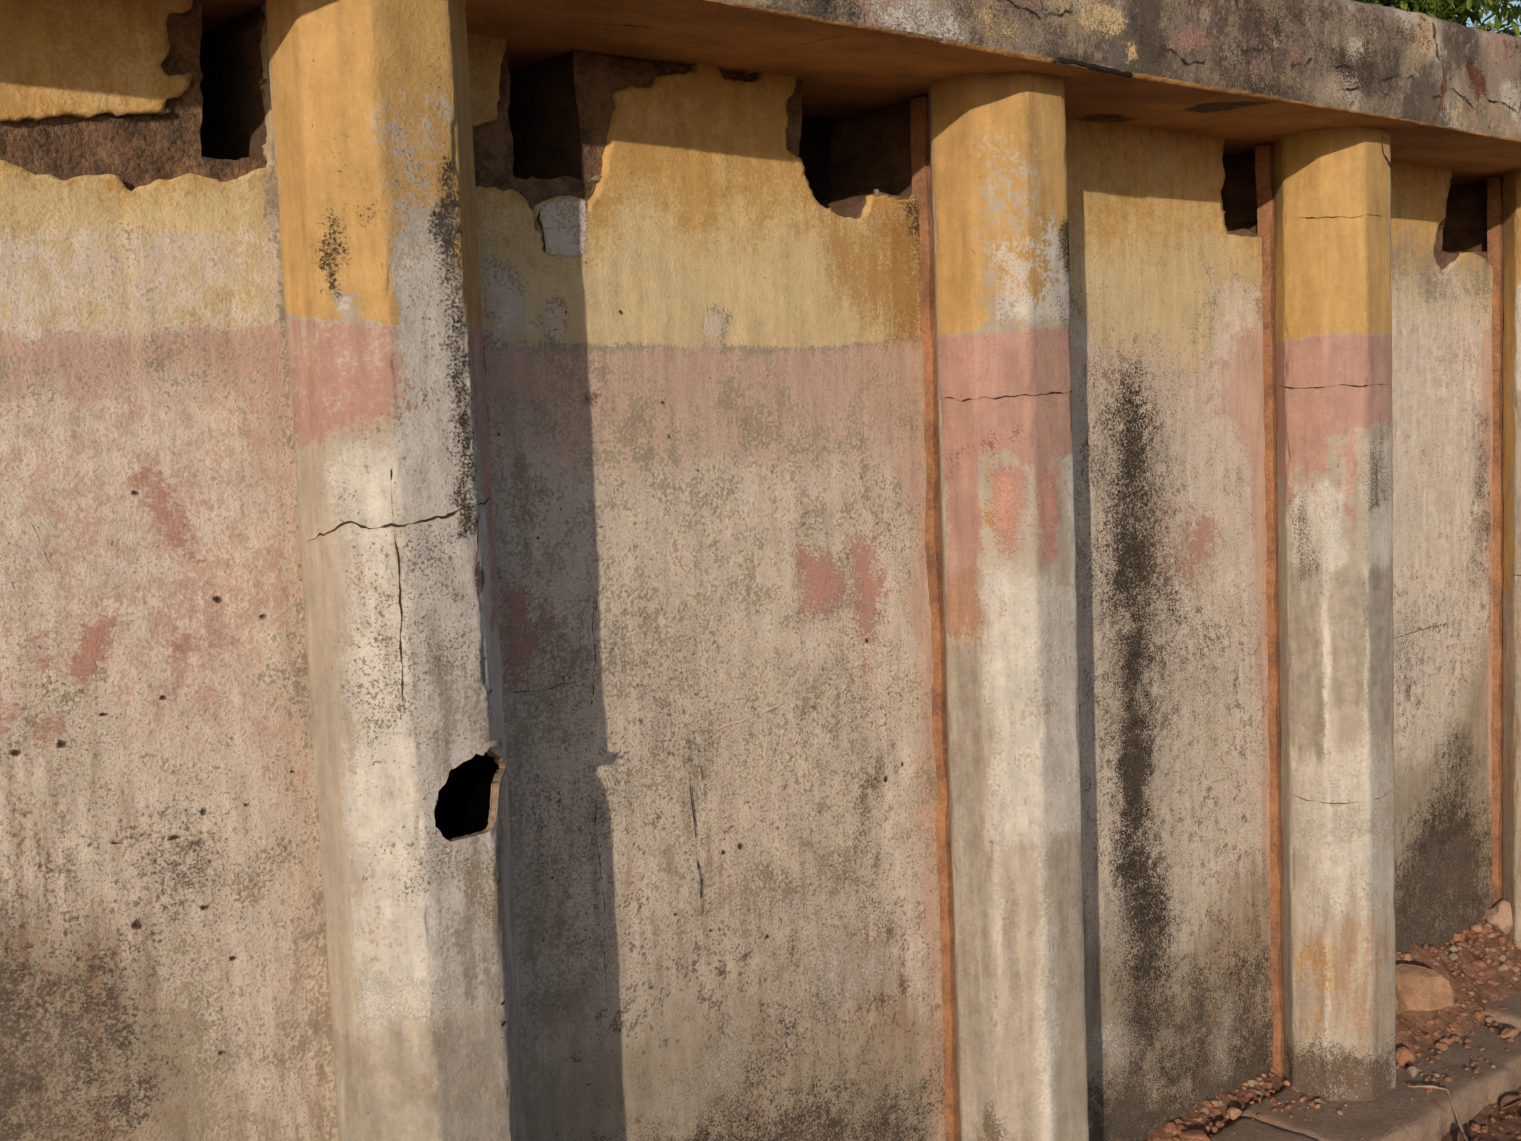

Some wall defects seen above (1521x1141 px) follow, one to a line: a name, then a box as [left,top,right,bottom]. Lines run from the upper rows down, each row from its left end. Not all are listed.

flaking render [0,0,267,189]
flaking render [472,44,694,263]
flaking render [1435,206,1489,269]
leakage [428,155,488,543]
crack [946,391,1072,402]
crack [1280,382,1387,390]
crack [308,468,494,707]
leakage [1470,403,1492,592]
spalling [434,740,507,842]
leakage [1075,343,1396,1141]
crack [1293,791,1390,804]
leakage [1394,710,1493,954]